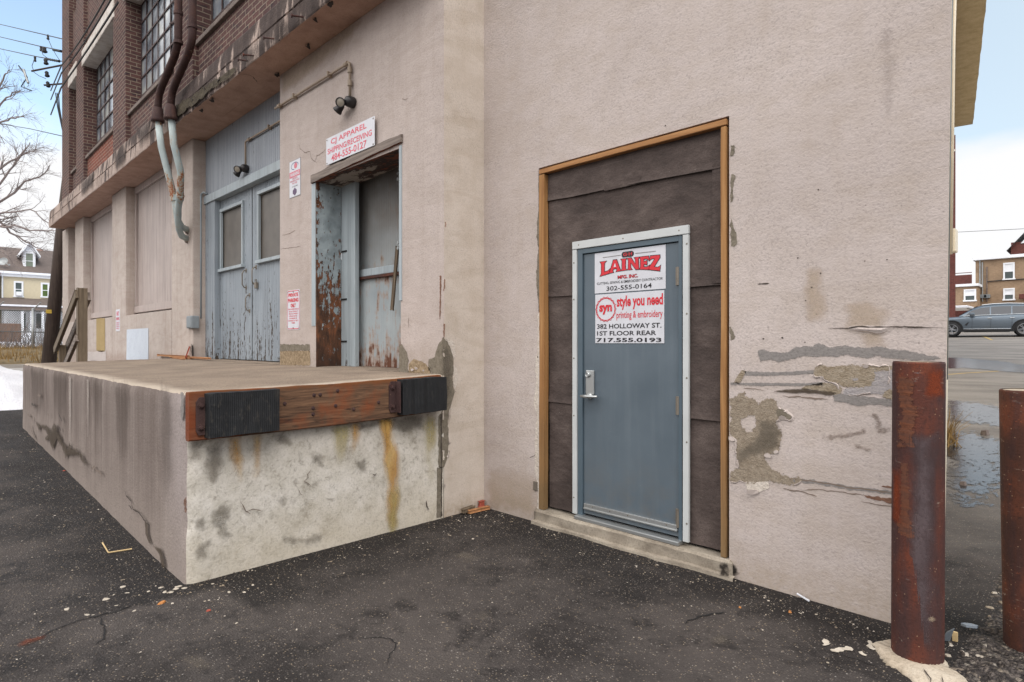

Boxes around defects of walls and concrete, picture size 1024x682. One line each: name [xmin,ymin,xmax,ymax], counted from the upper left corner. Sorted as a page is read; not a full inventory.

crack [839,323,938,331]
leakage [28,394,88,464]
spalling [728,363,892,495]
rust [381,420,397,529]
leakage [145,522,165,568]